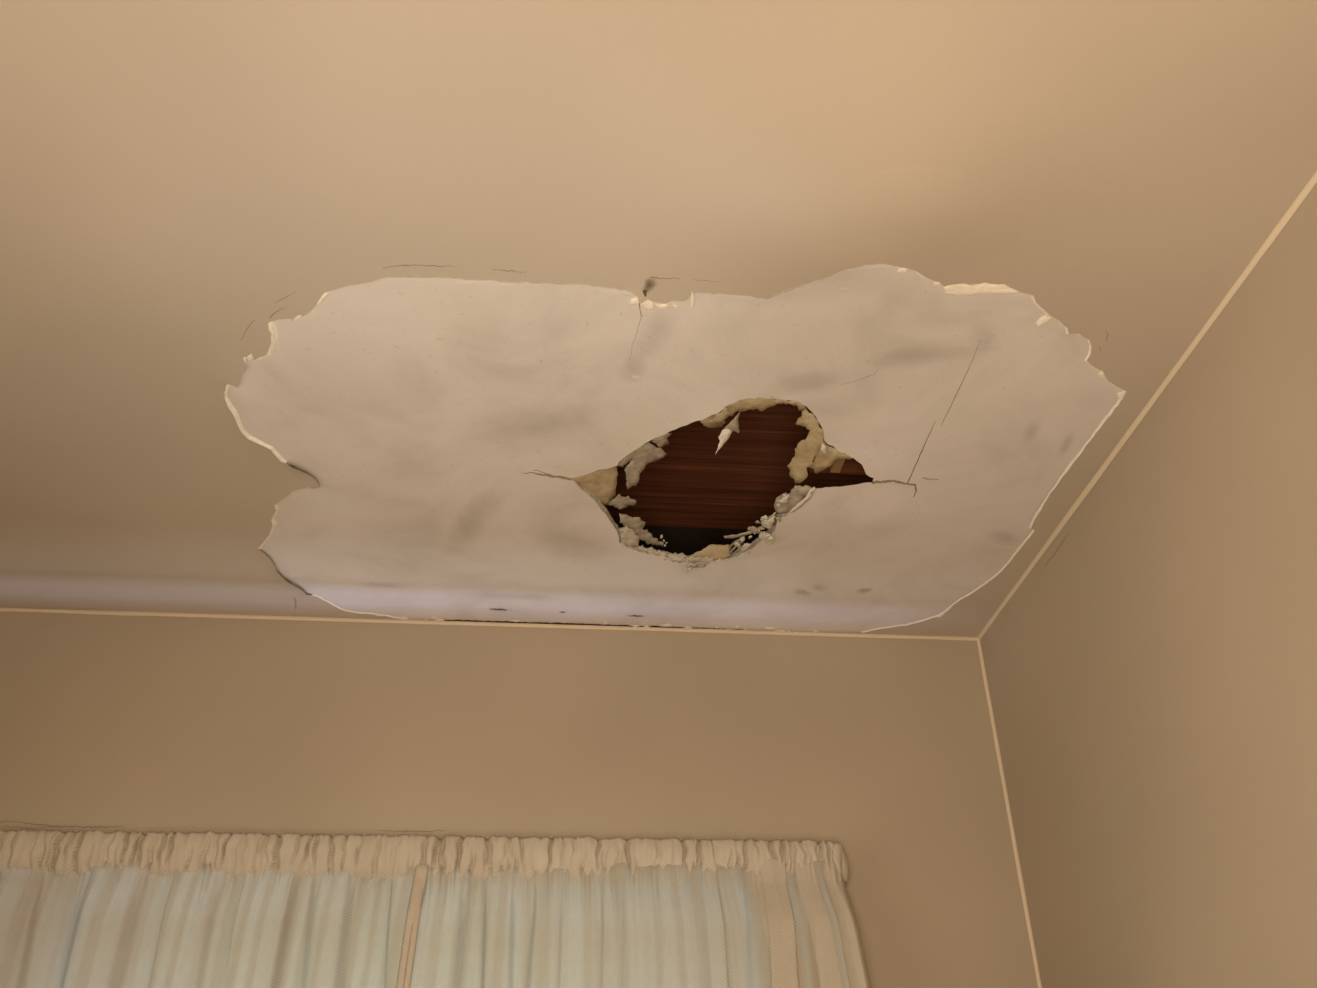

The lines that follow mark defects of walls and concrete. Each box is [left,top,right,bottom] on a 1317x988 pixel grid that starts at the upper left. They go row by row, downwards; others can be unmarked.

peeling [224,264,1126,633]
crack [872,342,980,497]